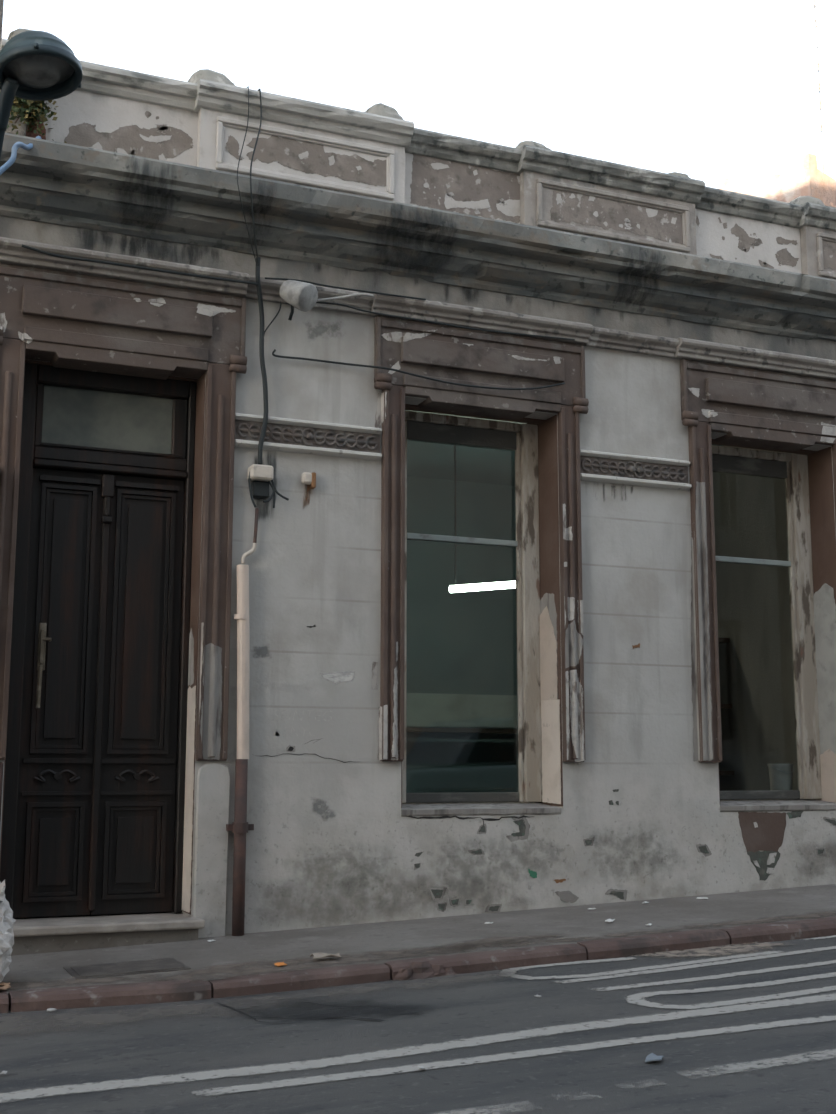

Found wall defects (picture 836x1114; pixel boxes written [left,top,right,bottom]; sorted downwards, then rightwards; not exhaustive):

peeling [64,111,193,161]
water stain [84,162,173,259]
peeling [226,135,386,192]
water stain [377,207,456,273]
peeling [410,154,520,223]
peeling [550,190,683,244]
peeling [710,217,799,269]
peeling [540,593,585,804]
peeling [813,583,836,803]
peeling [182,622,222,912]
crack [252,738,352,763]
spalling [506,815,530,841]